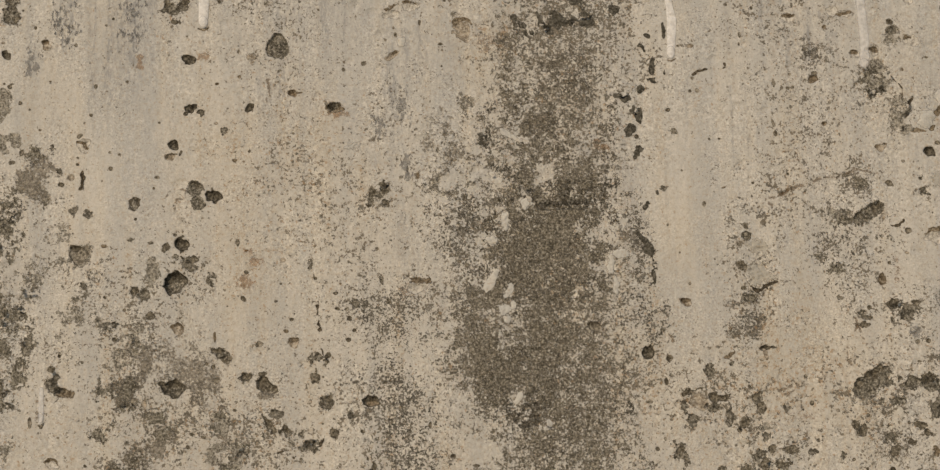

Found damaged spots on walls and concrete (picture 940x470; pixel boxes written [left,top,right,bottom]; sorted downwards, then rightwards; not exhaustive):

water stain [339,0,676,470]